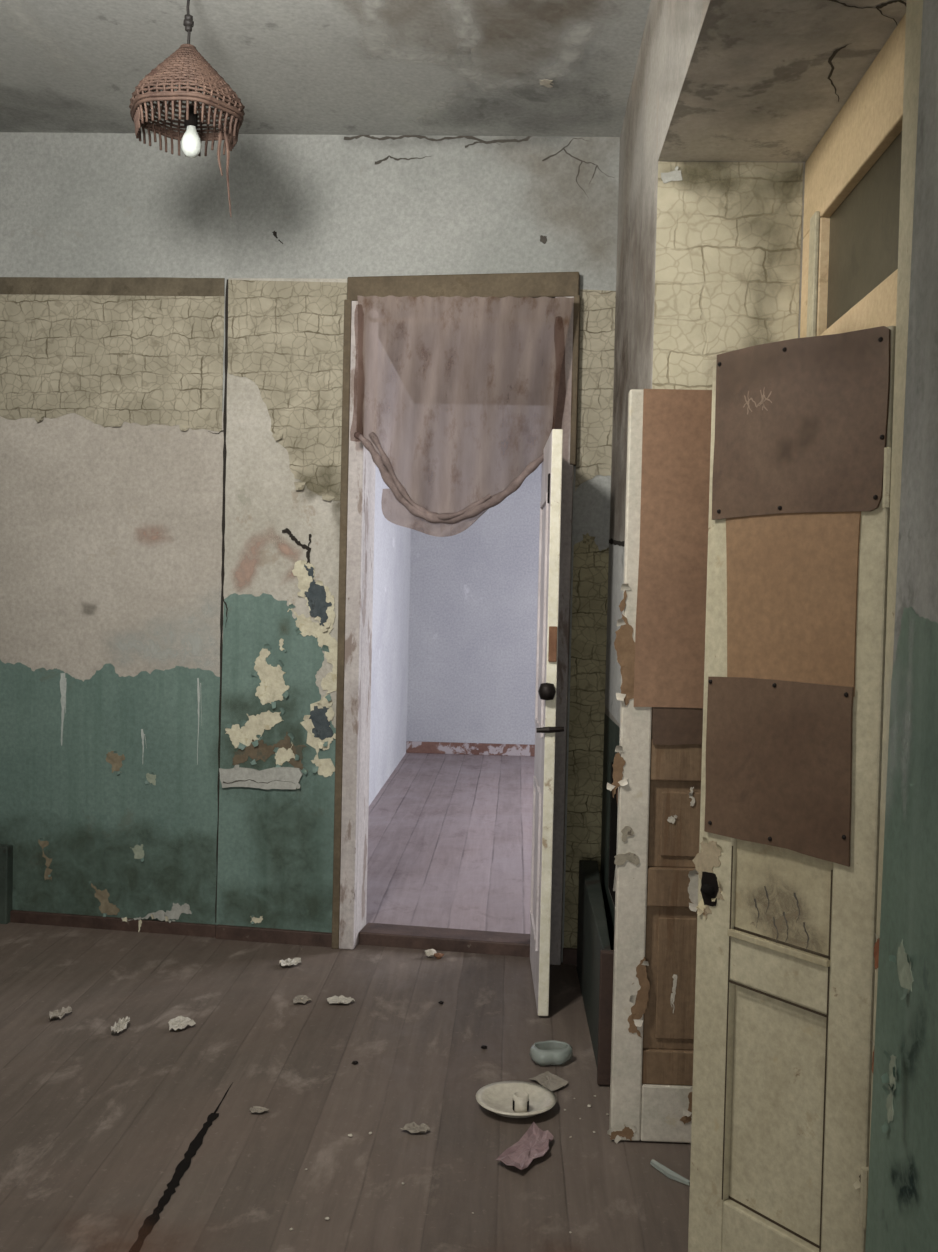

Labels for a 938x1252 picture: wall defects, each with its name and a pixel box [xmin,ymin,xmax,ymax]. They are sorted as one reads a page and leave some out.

crack [829,0,906,25]
leakage [365,0,593,88]
crack [827,43,852,102]
crack [344,135,614,197]
peeling [225,560,338,777]
peeling [889,939,914,1000]
crack [129,1084,232,1252]